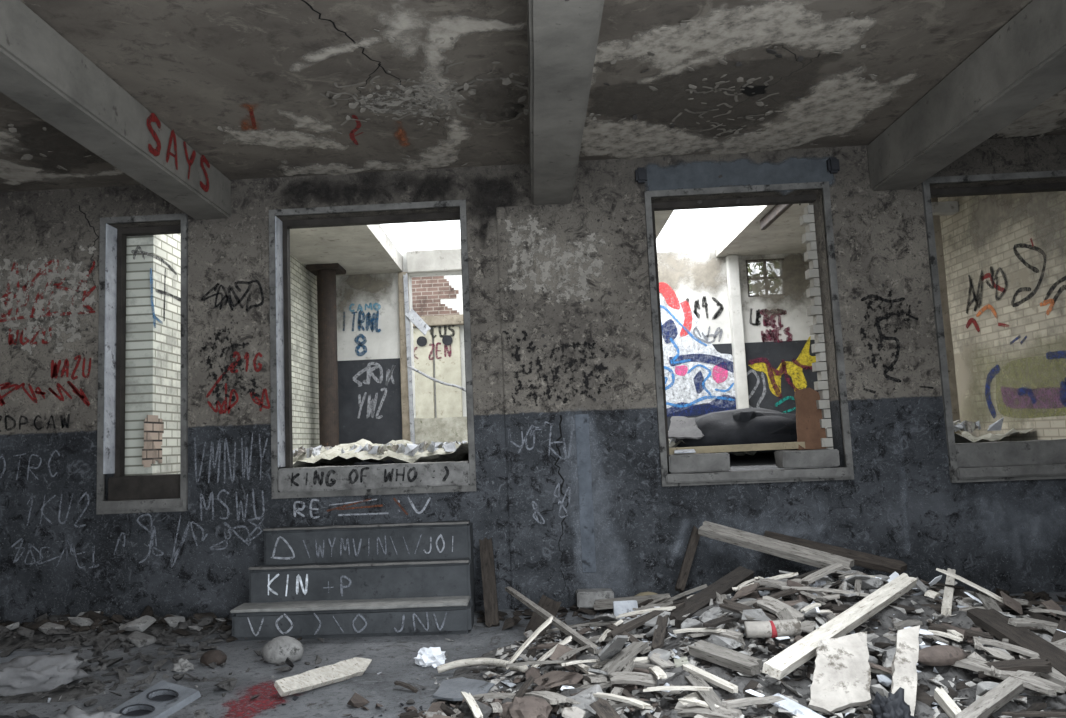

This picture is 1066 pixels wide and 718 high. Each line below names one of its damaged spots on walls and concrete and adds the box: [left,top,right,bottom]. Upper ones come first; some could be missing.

crack [301,0,484,134]